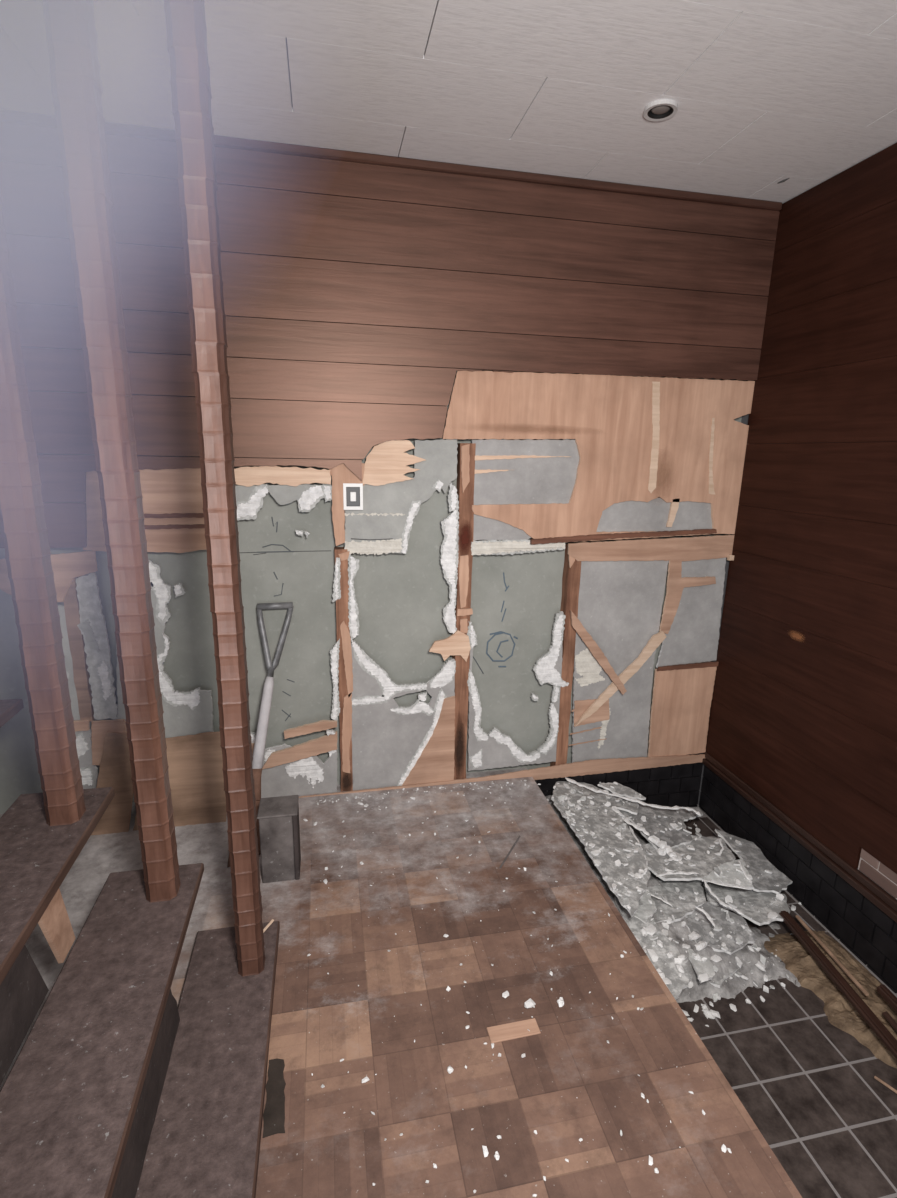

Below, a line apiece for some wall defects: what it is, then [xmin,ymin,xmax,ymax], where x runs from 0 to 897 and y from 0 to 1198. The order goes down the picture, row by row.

peeling [236,484,269,521]
peeling [298,484,332,512]
peeling [149,560,202,710]
peeling [326,480,605,786]
peeling [77,618,113,701]
peeling [76,732,93,786]
peeling [250,731,275,761]
peeling [285,750,337,788]
peeling [598,708,611,749]